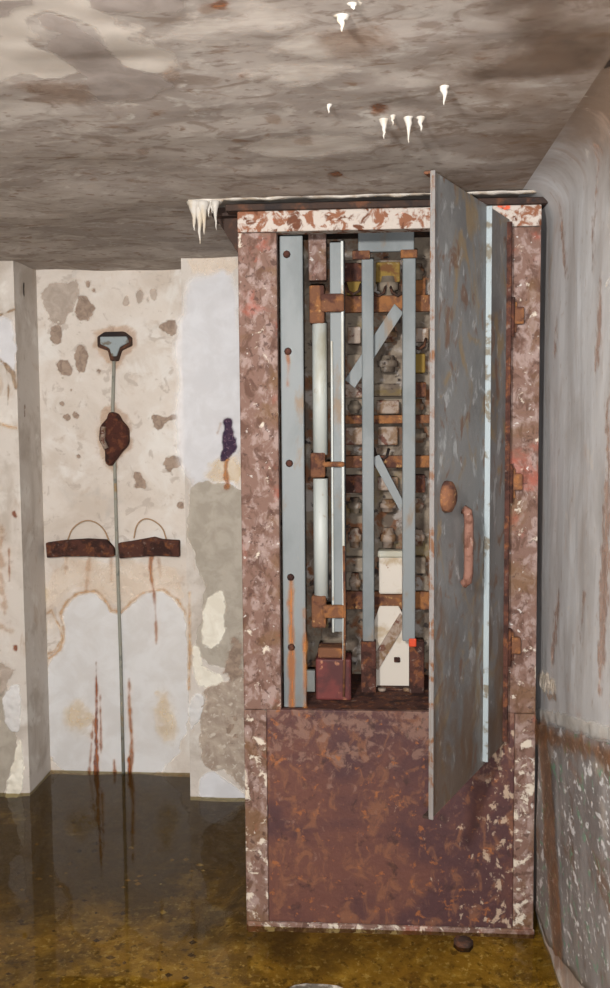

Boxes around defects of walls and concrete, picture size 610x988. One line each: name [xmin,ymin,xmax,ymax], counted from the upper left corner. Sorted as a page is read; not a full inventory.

damp [186,193,430,244]
corrosion [88,677,102,775]
damp [48,591,191,776]
spalling [177,481,245,800]
corrosion [535,717,610,968]